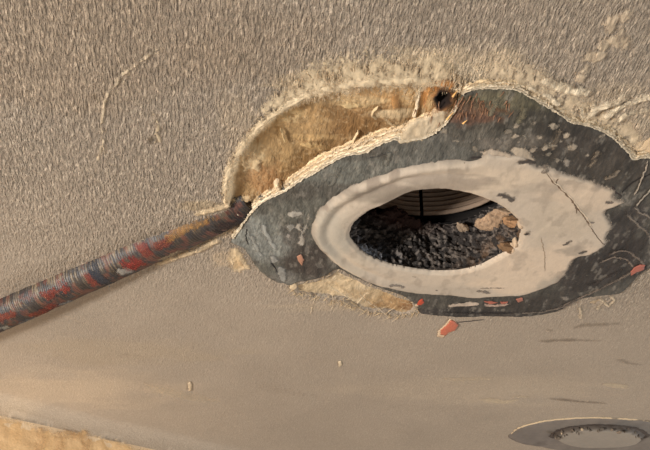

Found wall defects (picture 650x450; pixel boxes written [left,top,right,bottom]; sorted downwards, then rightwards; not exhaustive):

rust [423,80,514,128]
spalling [220,48,650,244]
spalling [228,248,250,273]
spalling [287,269,424,321]